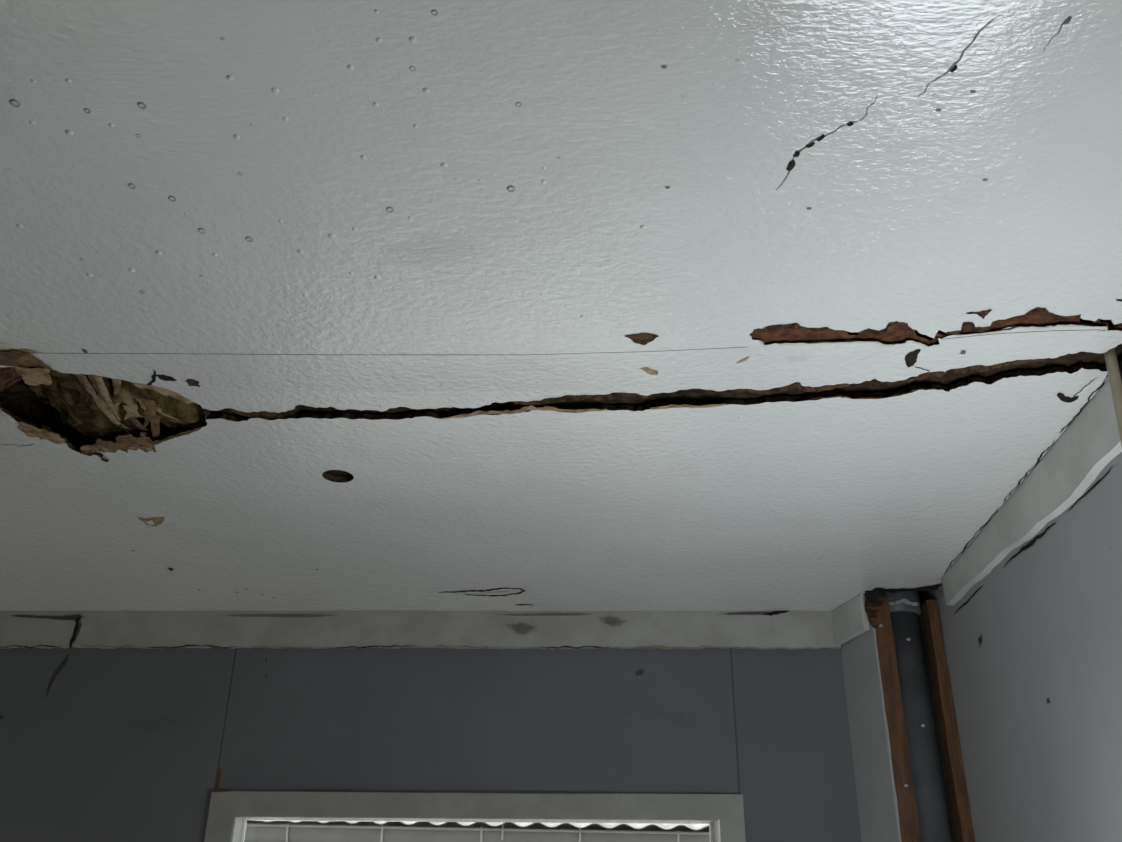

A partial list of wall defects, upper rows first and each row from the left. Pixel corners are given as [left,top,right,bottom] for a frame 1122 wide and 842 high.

crack [918,15,1001,98]
crack [779,98,877,187]
peeling [147,370,200,387]
crack [206,344,1122,422]
peeling [749,307,1122,372]
peeling [1057,378,1097,403]
crack [0,618,497,696]
crack [540,643,713,651]